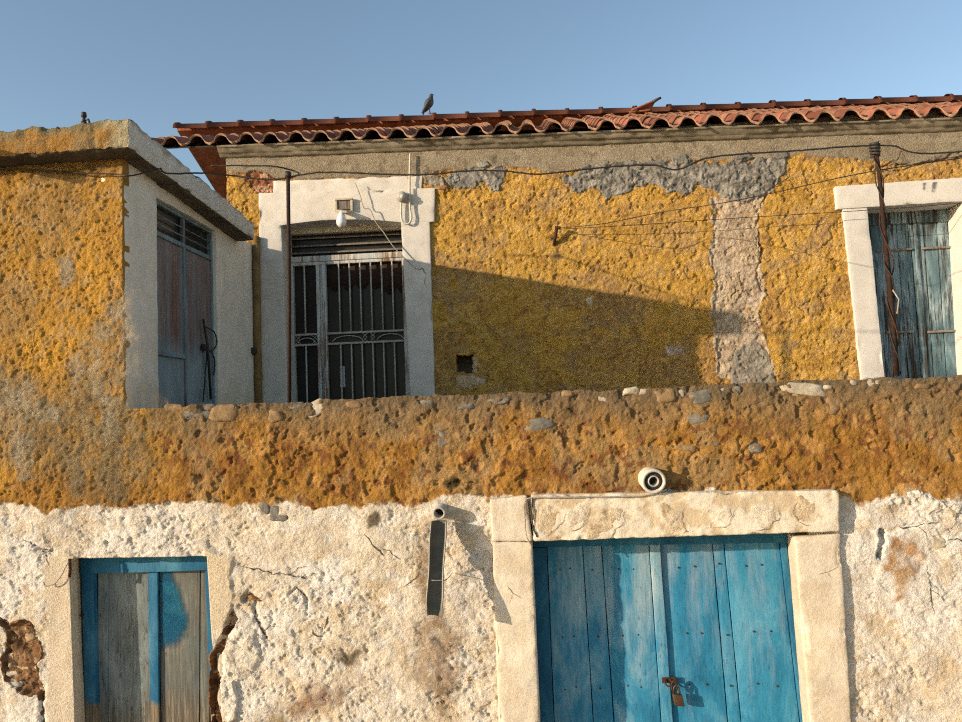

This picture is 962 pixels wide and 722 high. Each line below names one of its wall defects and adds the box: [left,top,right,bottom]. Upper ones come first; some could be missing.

peeling [707,191,776,379]
spalling [244,593,262,606]
crack [242,566,328,641]
spalling [0,617,45,701]
spalling [208,612,238,722]